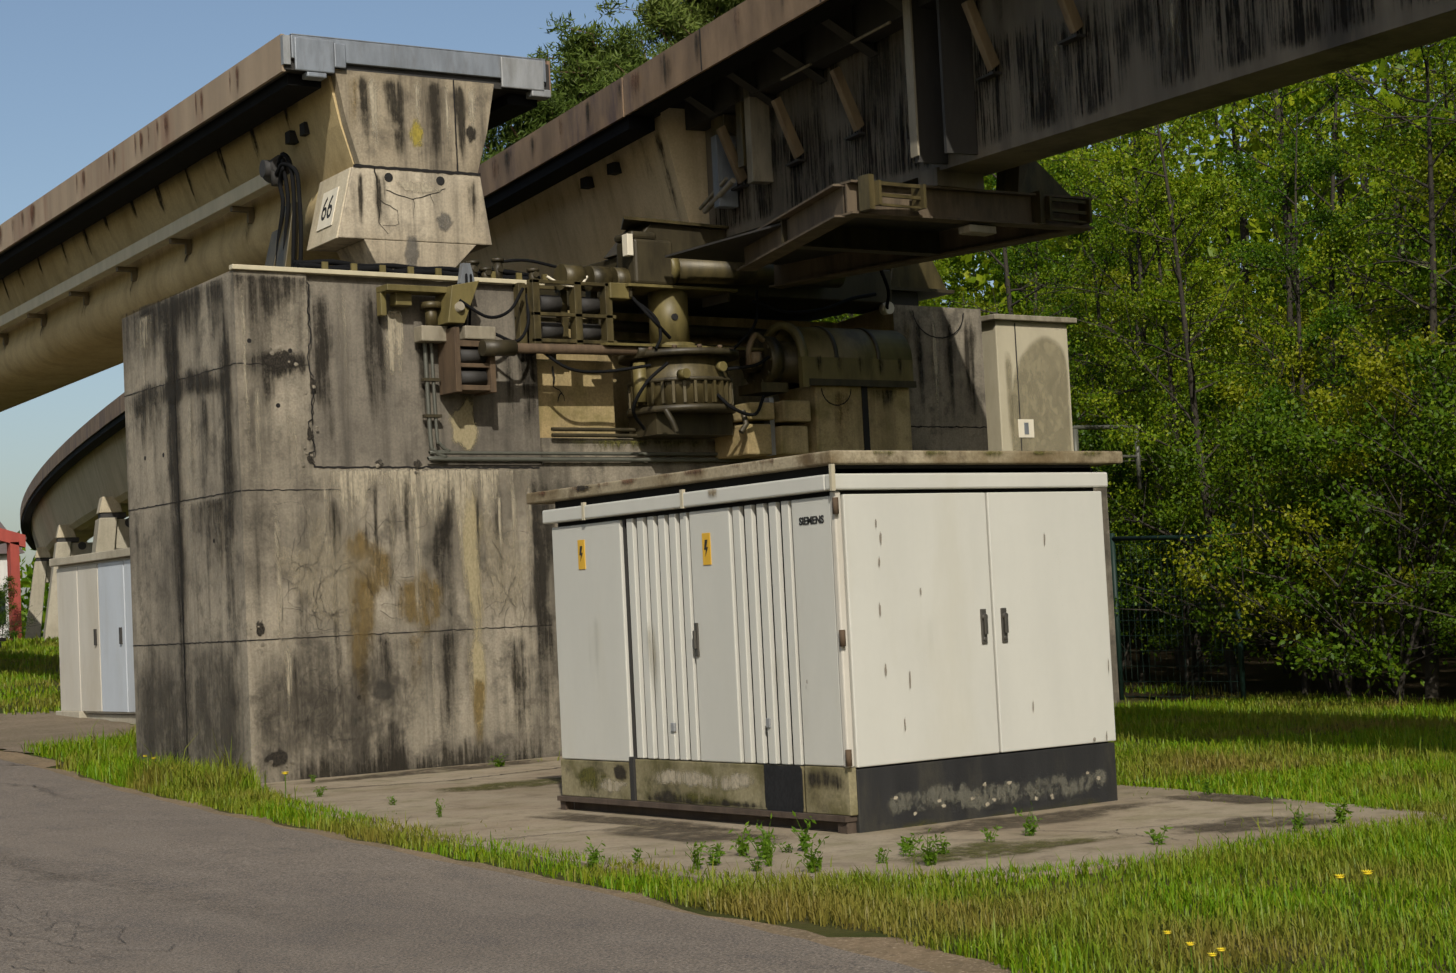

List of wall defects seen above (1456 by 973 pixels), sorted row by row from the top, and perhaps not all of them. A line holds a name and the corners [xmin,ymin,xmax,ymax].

leakage [359,78,476,155]
leakage [1024,13,1119,125]
leakage [1159,0,1198,82]
leakage [1218,0,1374,67]
leakage [358,175,382,218]
leakage [364,298,429,411]
leakage [506,311,537,419]
leakage [126,275,330,656]
leakage [286,653,296,695]
leakage [296,469,553,779]